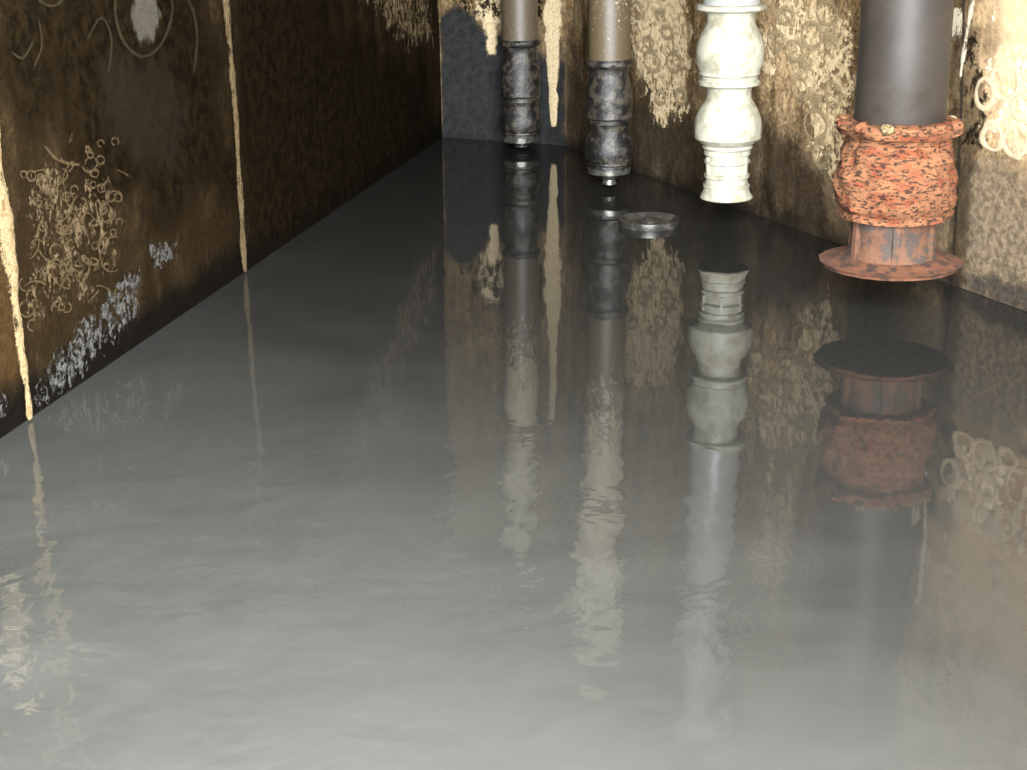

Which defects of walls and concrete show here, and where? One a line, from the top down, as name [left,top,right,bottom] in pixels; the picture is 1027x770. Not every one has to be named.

leakage [0,132,141,420]
leakage [0,0,432,272]
leakage [952,0,1027,146]
leakage [962,158,1027,309]